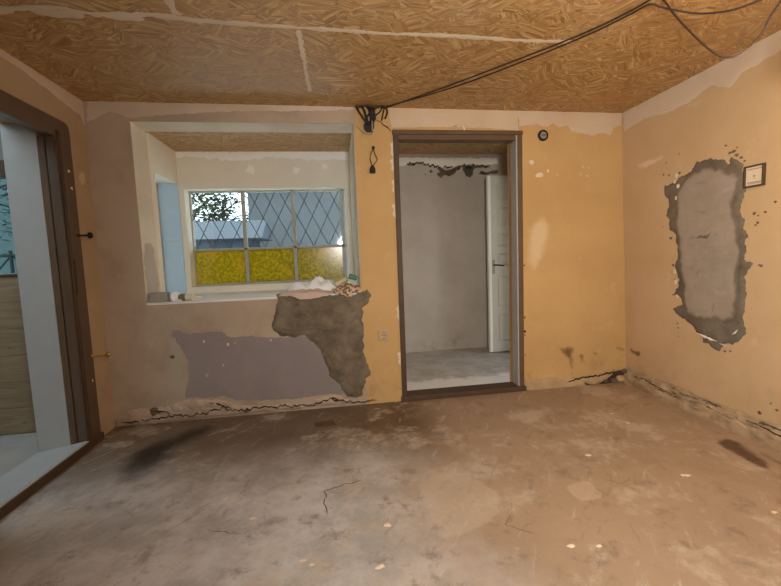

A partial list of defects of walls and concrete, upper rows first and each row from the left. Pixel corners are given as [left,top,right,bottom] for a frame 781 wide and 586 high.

peeling [390,141,498,192]
peeling [115,330,373,427]
water stain [129,430,203,469]
water stain [719,440,766,467]